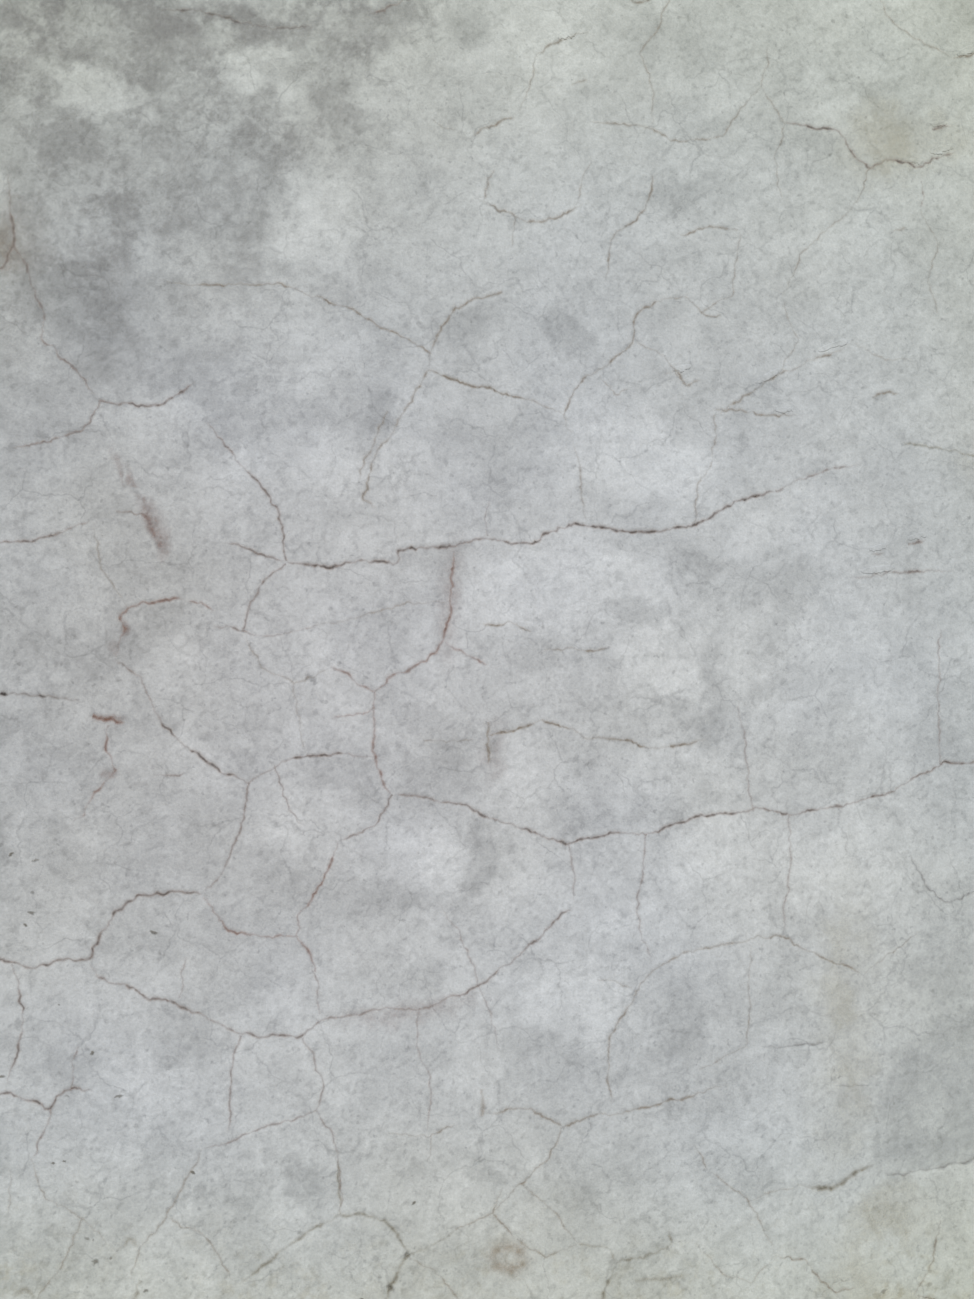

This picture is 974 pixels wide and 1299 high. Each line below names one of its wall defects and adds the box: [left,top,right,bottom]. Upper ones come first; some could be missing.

crack [505,495,760,544]
crack [81,891,191,960]